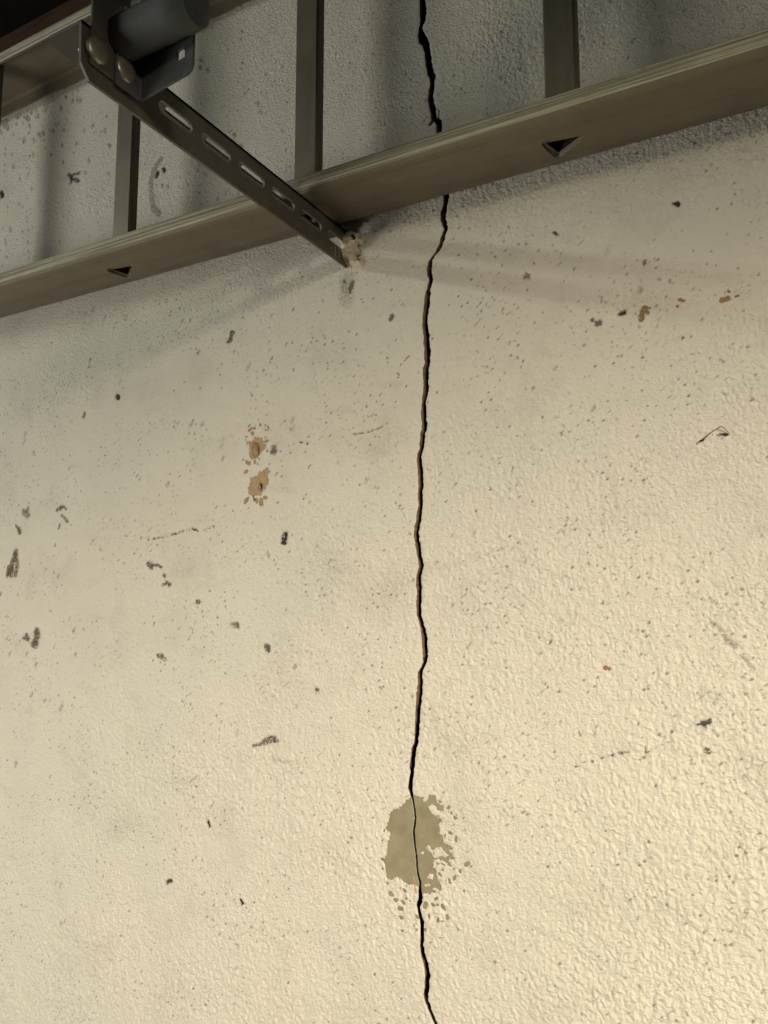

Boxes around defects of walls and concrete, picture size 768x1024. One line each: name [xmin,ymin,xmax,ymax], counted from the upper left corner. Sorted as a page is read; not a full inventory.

crack [418,0,442,134]
peeling [244,424,277,506]
crack [397,194,449,1024]
peeling [381,795,470,933]